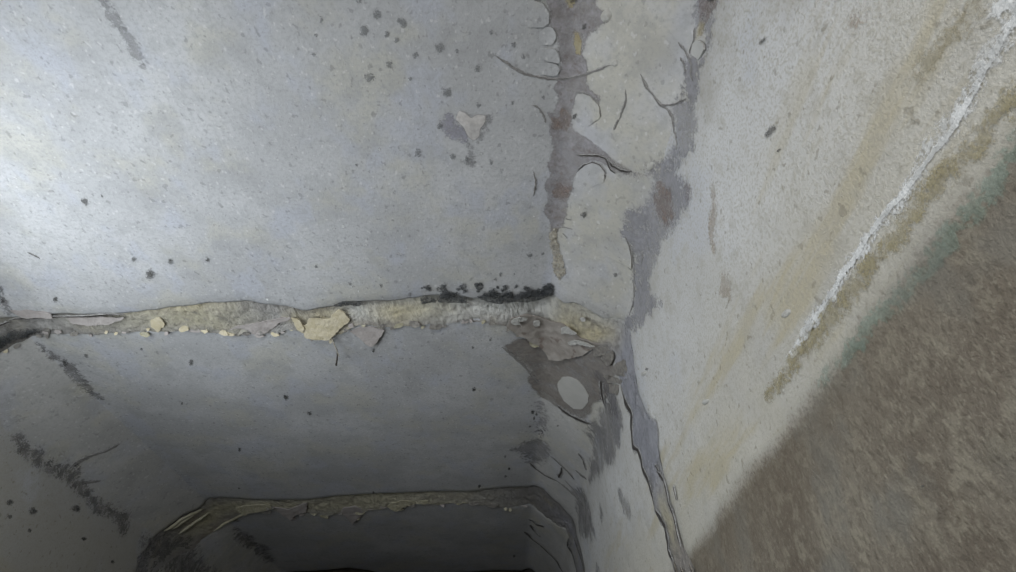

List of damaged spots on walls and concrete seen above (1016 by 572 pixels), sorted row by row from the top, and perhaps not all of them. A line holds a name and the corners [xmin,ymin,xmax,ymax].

leakage [681,57,702,112]
leakage [408,0,630,304]
leakage [786,0,1016,359]
leakage [620,144,693,329]
peeling [10,309,126,339]
peeling [140,309,397,347]
spalling [469,314,627,395]
leakage [506,339,622,480]
peeling [557,377,589,409]